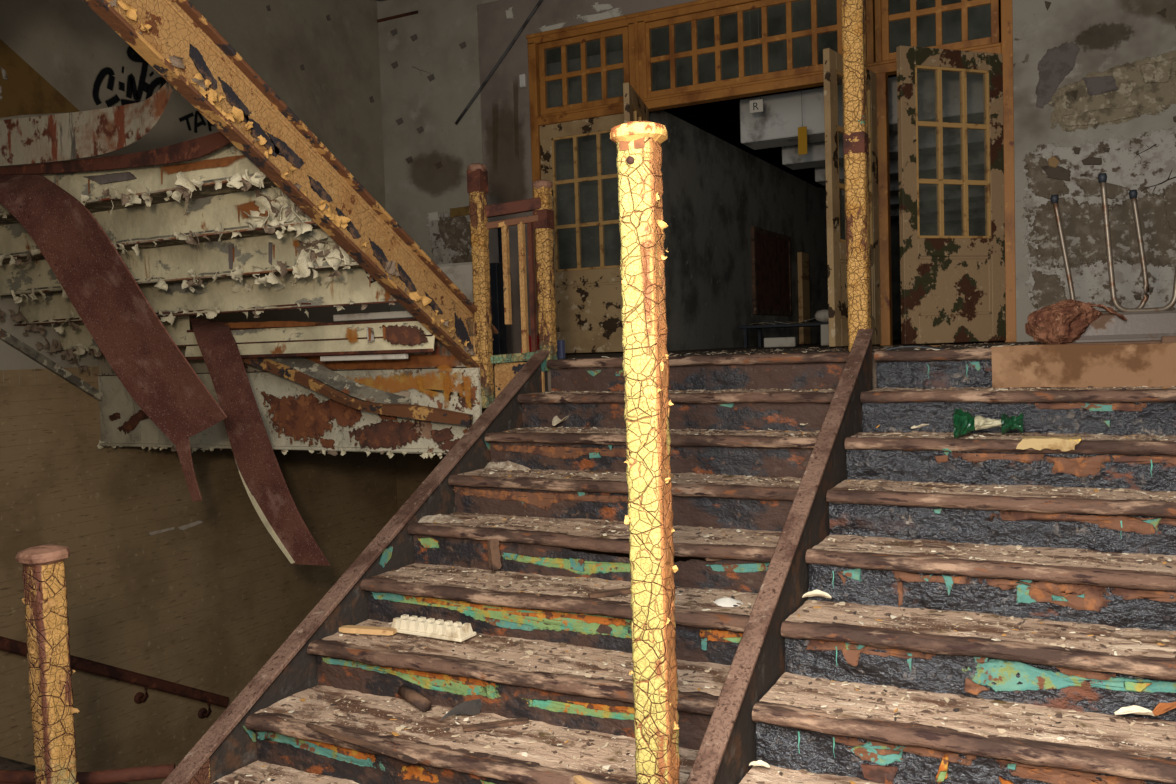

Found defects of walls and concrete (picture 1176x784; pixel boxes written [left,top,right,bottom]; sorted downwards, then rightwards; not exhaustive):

rust [160,155,246,184]
peeling [1021,42,1176,313]
peeling [80,43,479,361]
rust [303,324,471,408]
rust [109,410,149,435]
rust [261,391,460,451]
peeling [502,552,630,575]
peeling [371,592,632,638]
peeling [802,590,831,598]
peeling [322,657,508,699]
peeling [962,656,1176,695]
peeling [522,698,635,720]